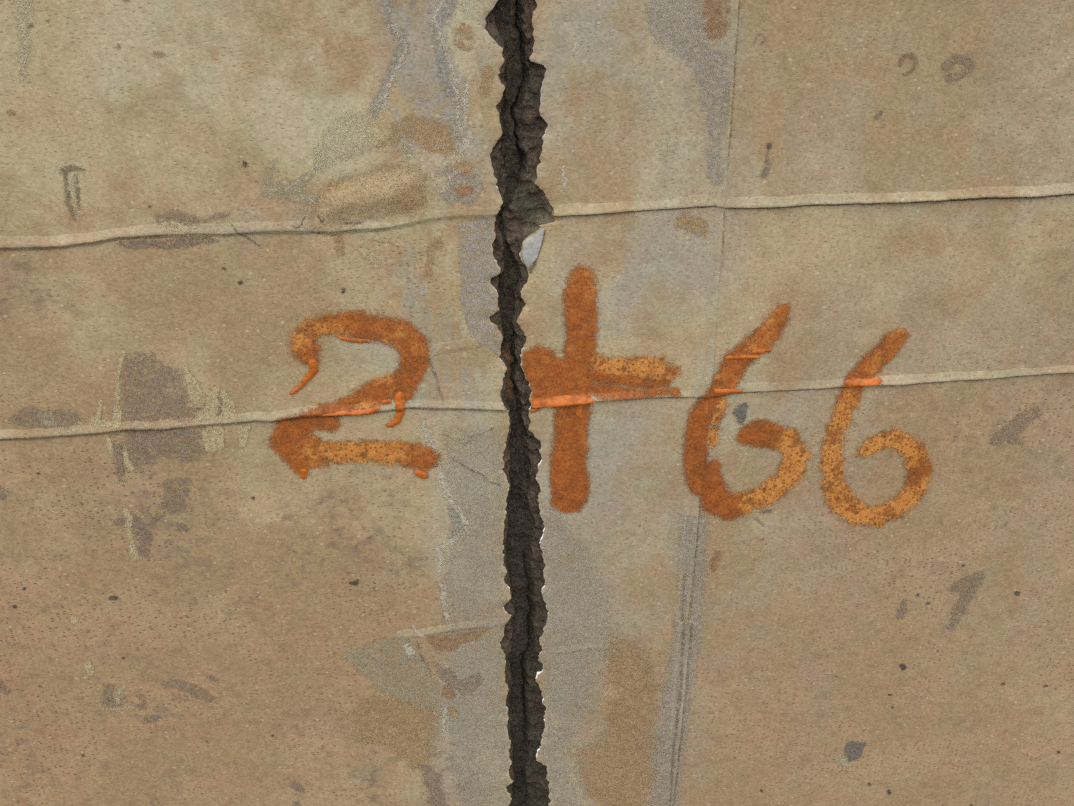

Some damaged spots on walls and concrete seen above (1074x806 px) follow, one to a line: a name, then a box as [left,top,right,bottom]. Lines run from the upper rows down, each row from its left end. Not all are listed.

crack [366,0,1074,806]